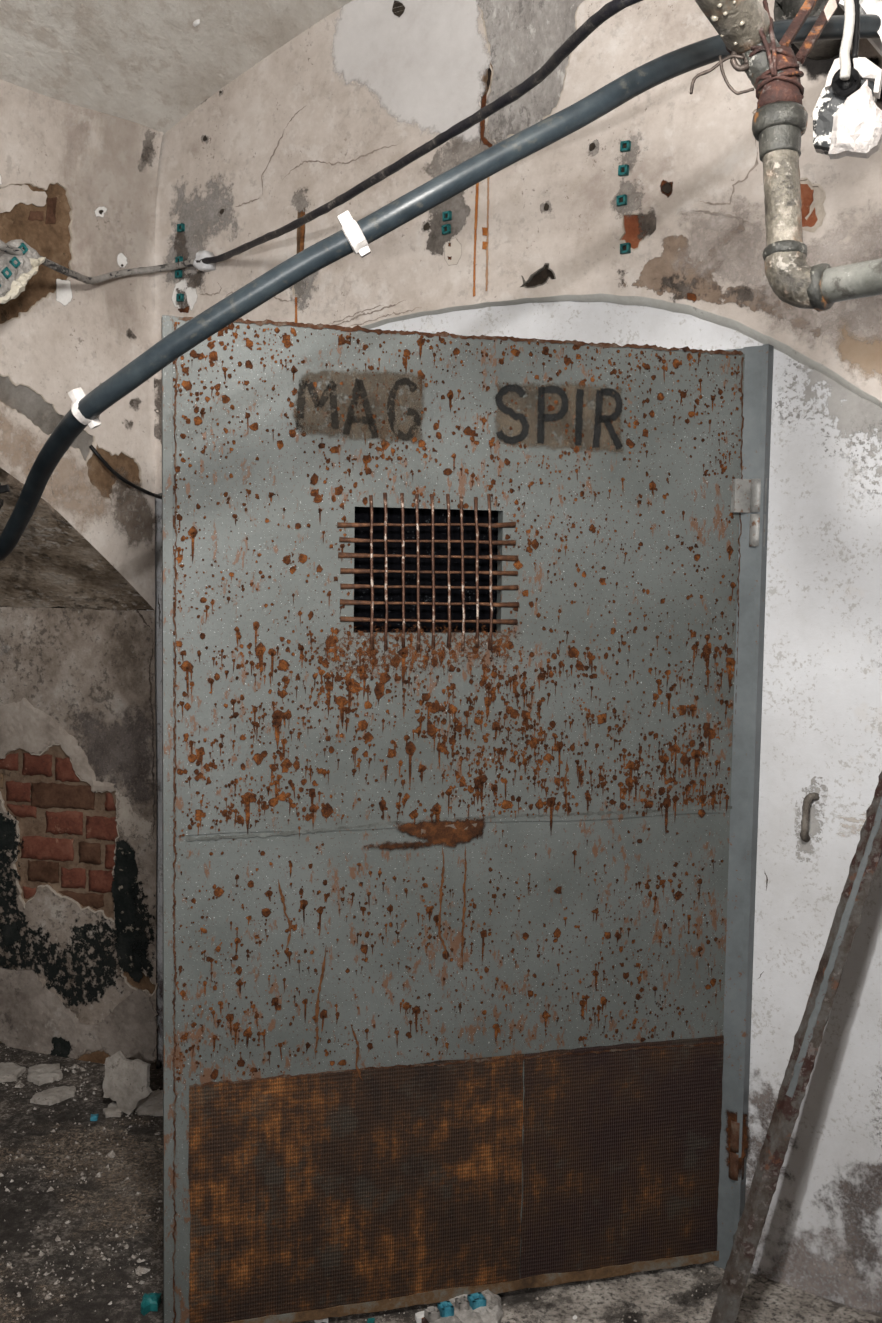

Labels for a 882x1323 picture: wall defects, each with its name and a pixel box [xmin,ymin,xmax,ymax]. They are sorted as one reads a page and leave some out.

crack [235,105,400,207]
corrosion [480,94,492,148]
flaking render [476,0,585,143]
flaking render [0,182,74,326]
corrosion [473,177,489,297]
leakage [677,205,882,375]
flaking render [0,373,65,436]
corrosion [162,297,744,1323]
flaking render [0,698,158,1106]
corrosion [725,1110,750,1176]
leakage [745,1073,777,1201]
leakage [751,1163,882,1320]